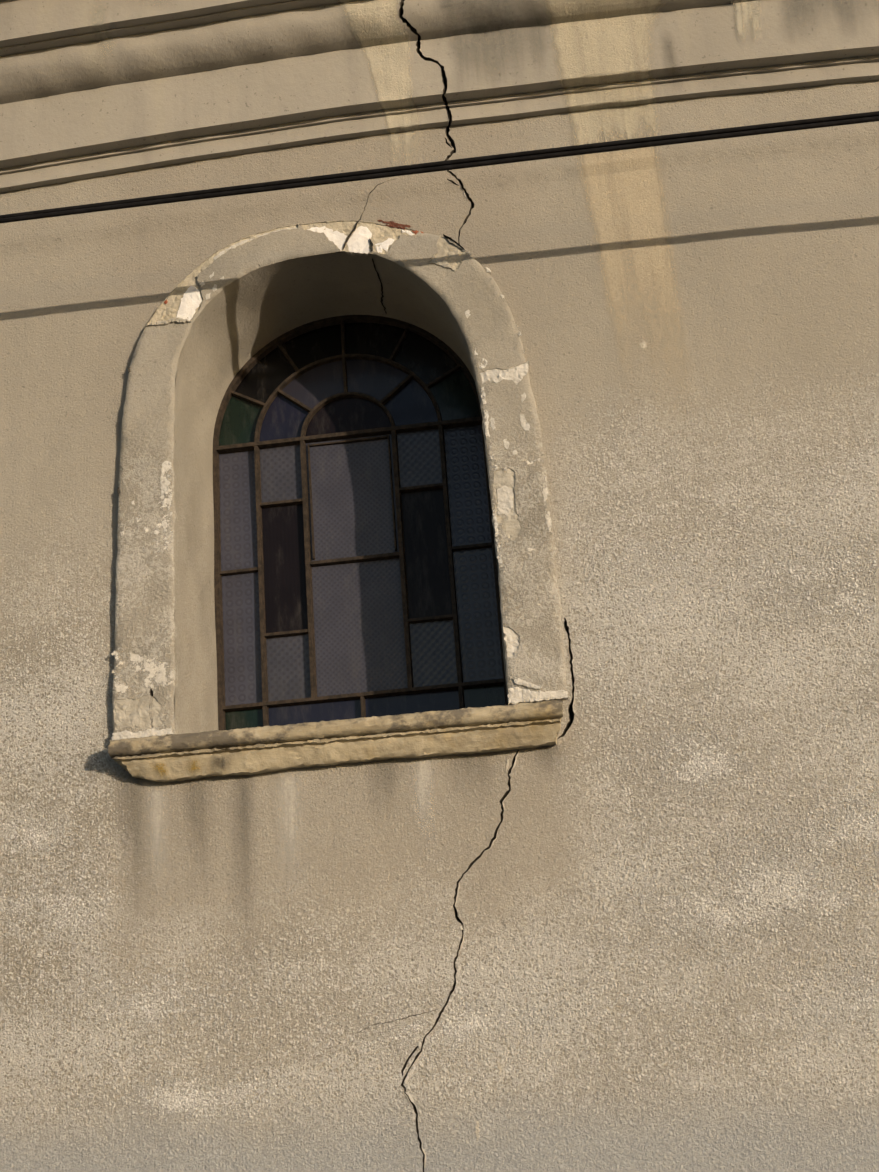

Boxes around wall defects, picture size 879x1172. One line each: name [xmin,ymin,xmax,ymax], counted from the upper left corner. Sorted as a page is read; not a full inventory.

crack [398,0,474,251]
damp [547,0,676,319]
flaking render [146,220,423,327]
crack [343,179,394,314]
peeling [120,461,173,557]
peeling [474,348,543,568]
peeling [111,648,174,740]
peeling [503,625,520,657]
flaking render [507,678,568,705]
crack [558,619,575,739]
damp [416,760,431,815]
crack [355,750,519,1172]